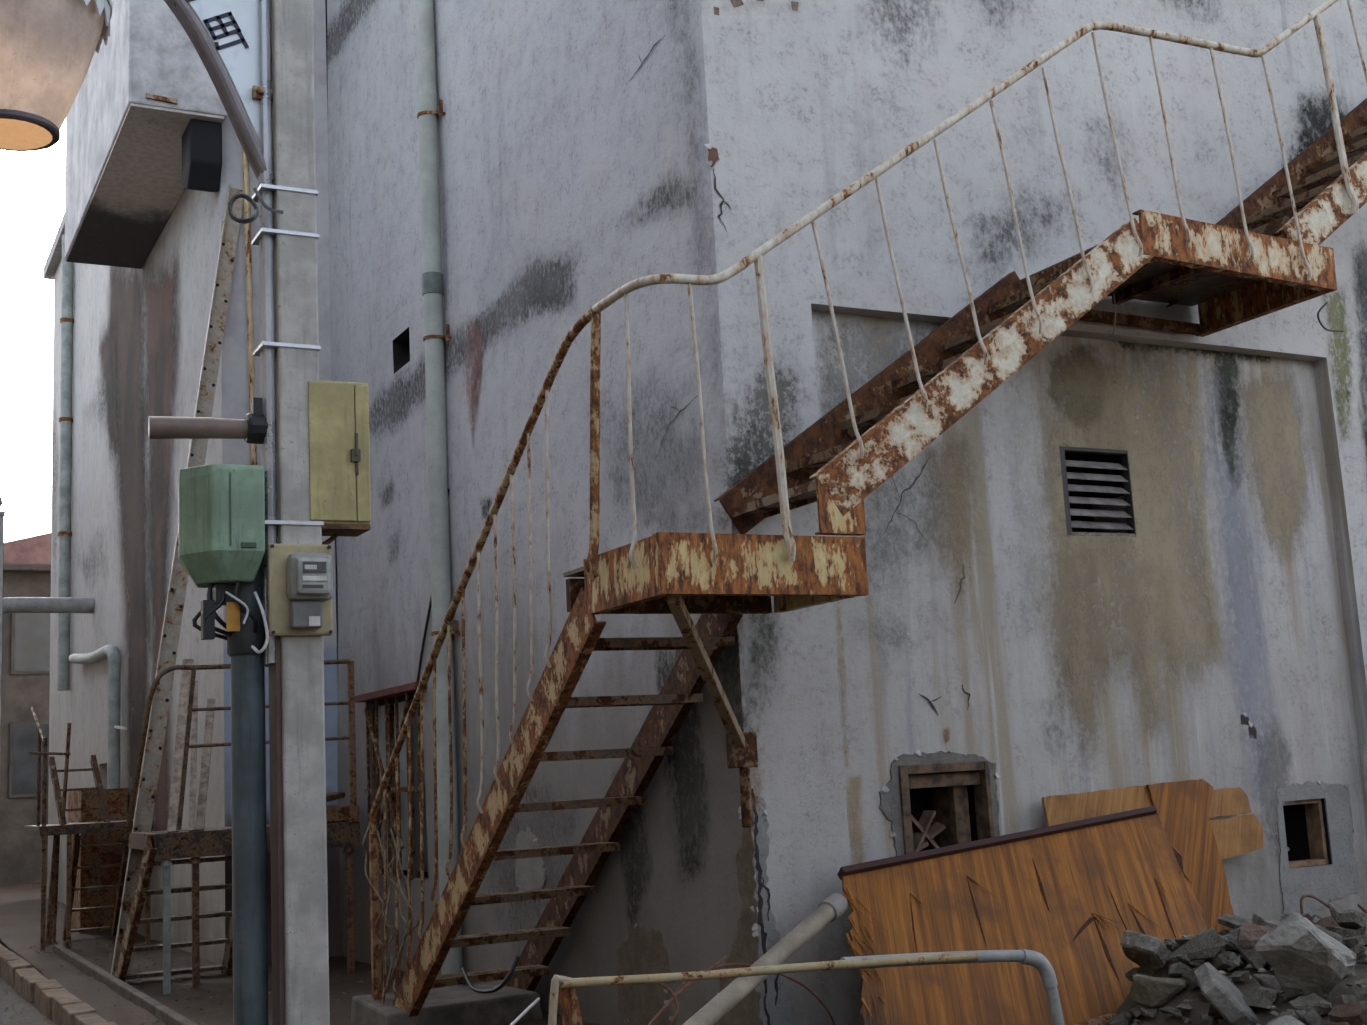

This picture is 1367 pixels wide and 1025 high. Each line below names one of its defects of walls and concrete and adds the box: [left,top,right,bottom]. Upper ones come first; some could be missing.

crack [628,35,665,82]
peeling [714,0,764,15]
crack [713,169,731,232]
leakage [369,360,425,432]
rust [467,322,482,433]
leakage [444,259,576,373]
leakage [1336,247,1367,455]
leakage [99,261,178,832]
leakage [866,444,971,584]
leakage [1016,341,1307,855]
spalling [879,750,1000,856]